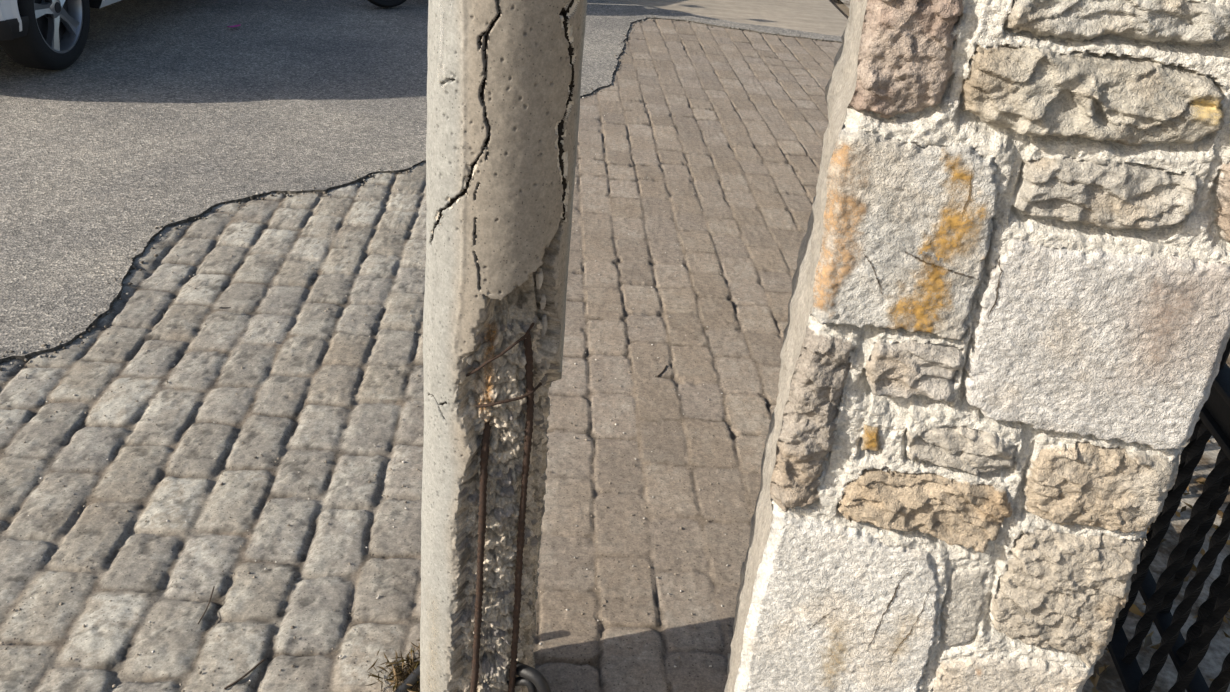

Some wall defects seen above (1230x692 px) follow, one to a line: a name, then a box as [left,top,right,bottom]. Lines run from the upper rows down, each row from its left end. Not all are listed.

rust [947,158,971,184]
rust [813,191,865,309]
rust [891,207,984,333]
crack [868,572,929,661]